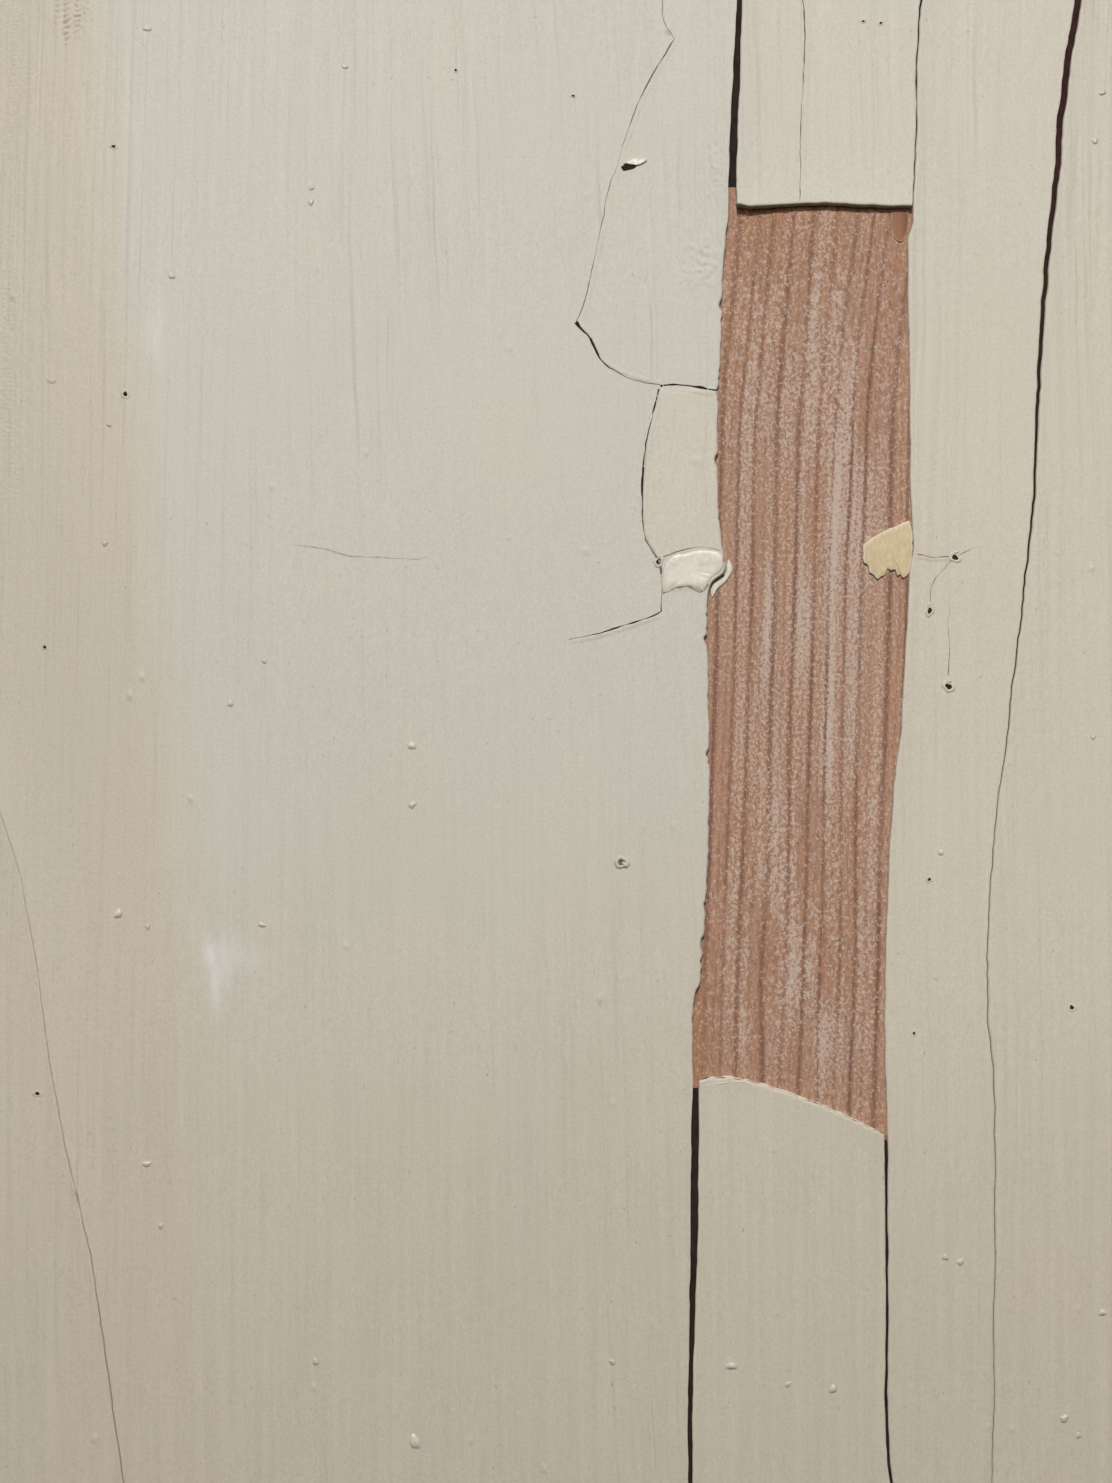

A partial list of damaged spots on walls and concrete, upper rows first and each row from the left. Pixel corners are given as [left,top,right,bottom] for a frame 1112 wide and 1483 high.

crack [728,0,742,206]
crack [800,0,811,201]
crack [913,0,922,189]
crack [569,0,724,645]
peeling [692,186,914,1140]
crack [917,549,971,676]
crack [986,0,1081,960]
crack [688,1087,699,1483]
crack [884,1140,892,1483]